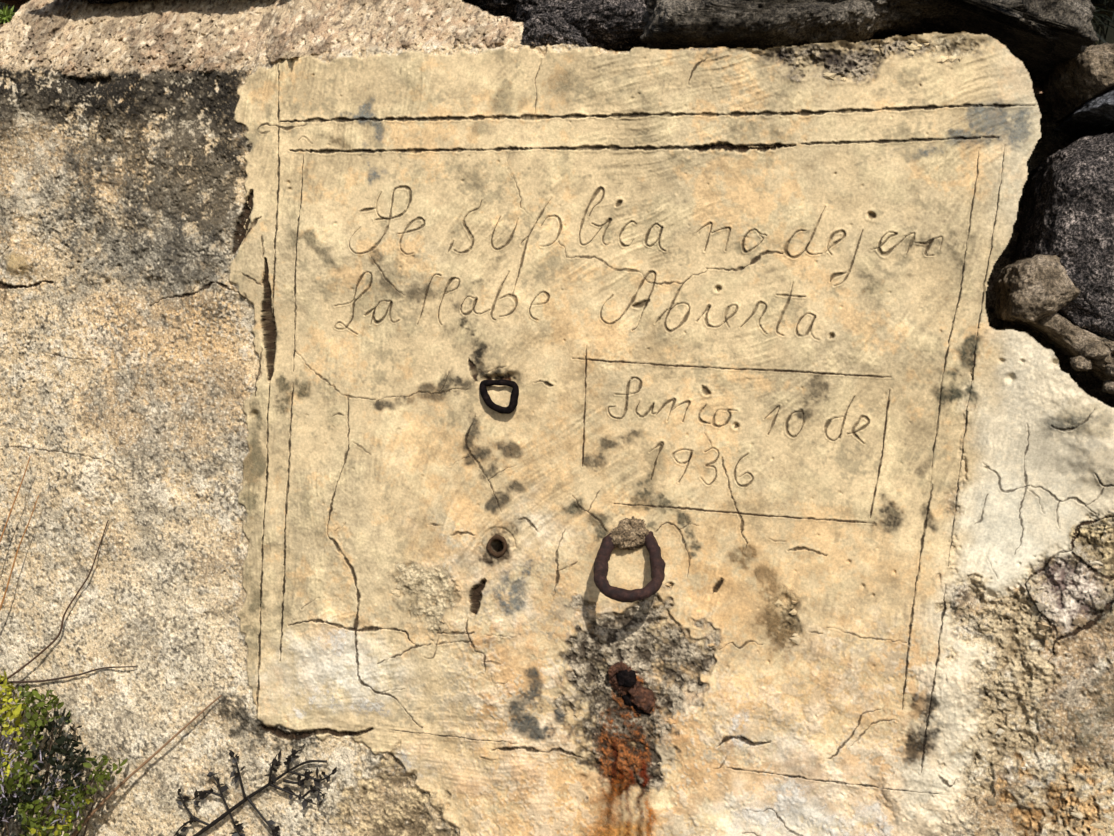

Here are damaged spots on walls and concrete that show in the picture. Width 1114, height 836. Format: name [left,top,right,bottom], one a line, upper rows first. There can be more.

crack [0,281,53,303]
crack [151,192,504,728]
crack [465,420,576,590]
crack [572,495,605,530]
crack [980,409,1114,662]
crack [262,724,373,740]
rust [592,693,658,836]
spalling [553,583,721,792]
spalling [936,517,1114,836]